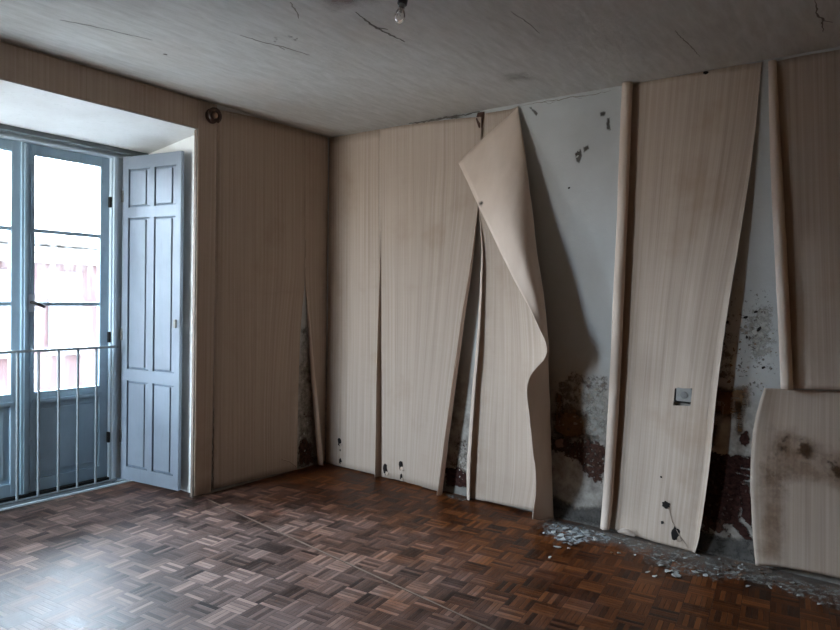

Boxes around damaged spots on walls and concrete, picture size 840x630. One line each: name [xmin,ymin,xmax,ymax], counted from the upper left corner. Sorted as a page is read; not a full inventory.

crack [240,35,308,55]
crack [356,12,405,42]
peeling [719,299,777,396]
damp [297,366,314,467]
damp [553,393,586,438]
damp [700,387,752,540]
damp [799,443,810,458]